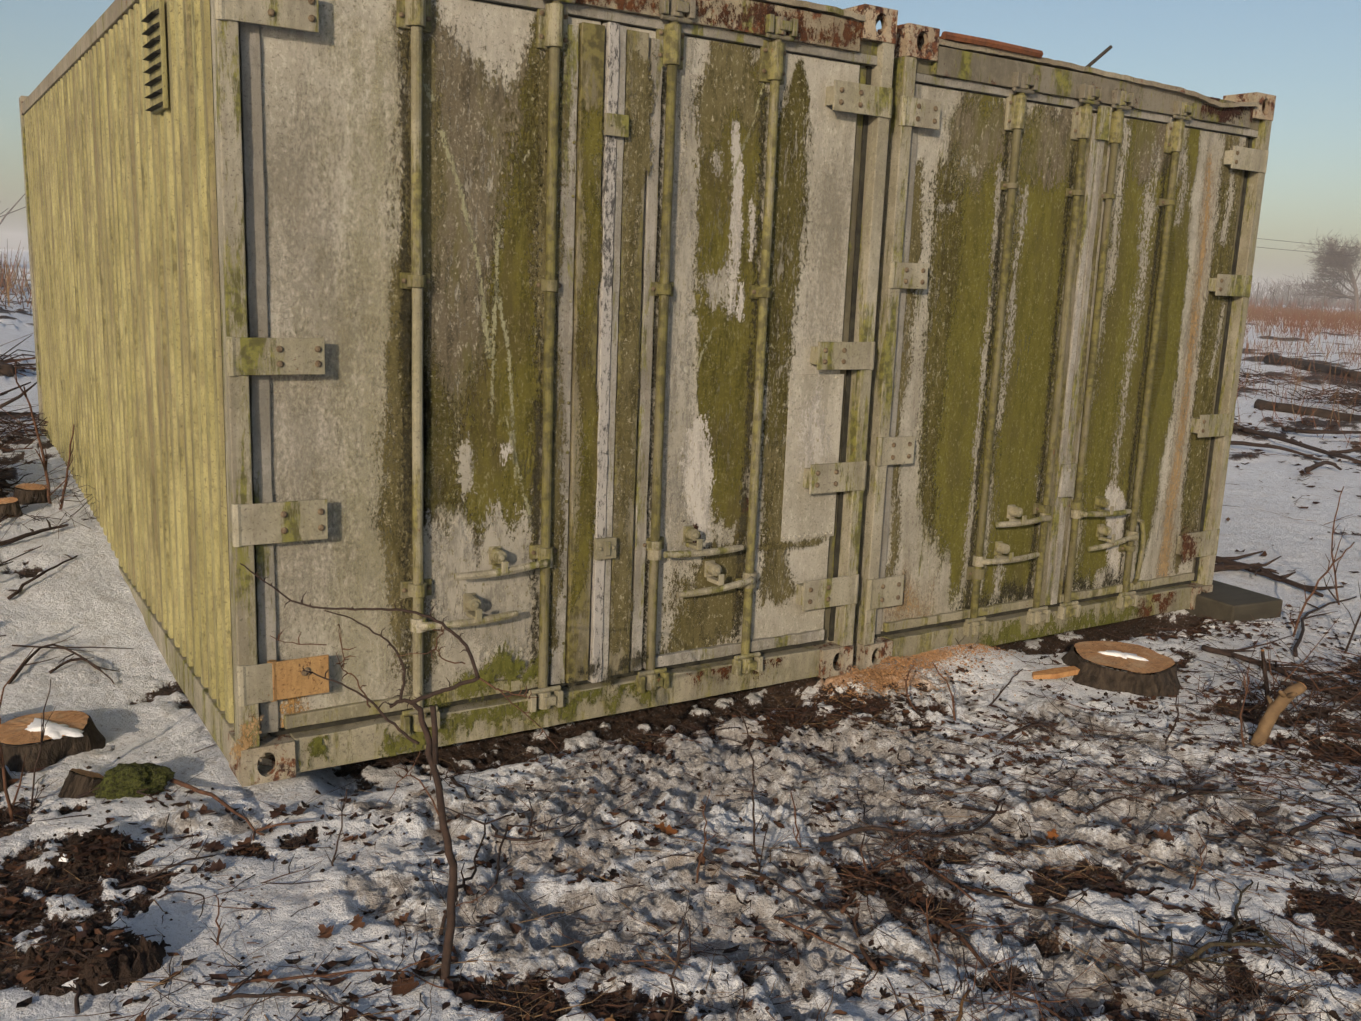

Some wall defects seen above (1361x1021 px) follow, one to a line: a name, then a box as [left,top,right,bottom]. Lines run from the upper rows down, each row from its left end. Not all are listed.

corrosion [576,0,863,48]
leakage [396,30,412,581]
leakage [527,293,544,676]
leakage [732,88,770,642]
leakage [952,132,1076,610]
leakage [1062,155,1169,594]